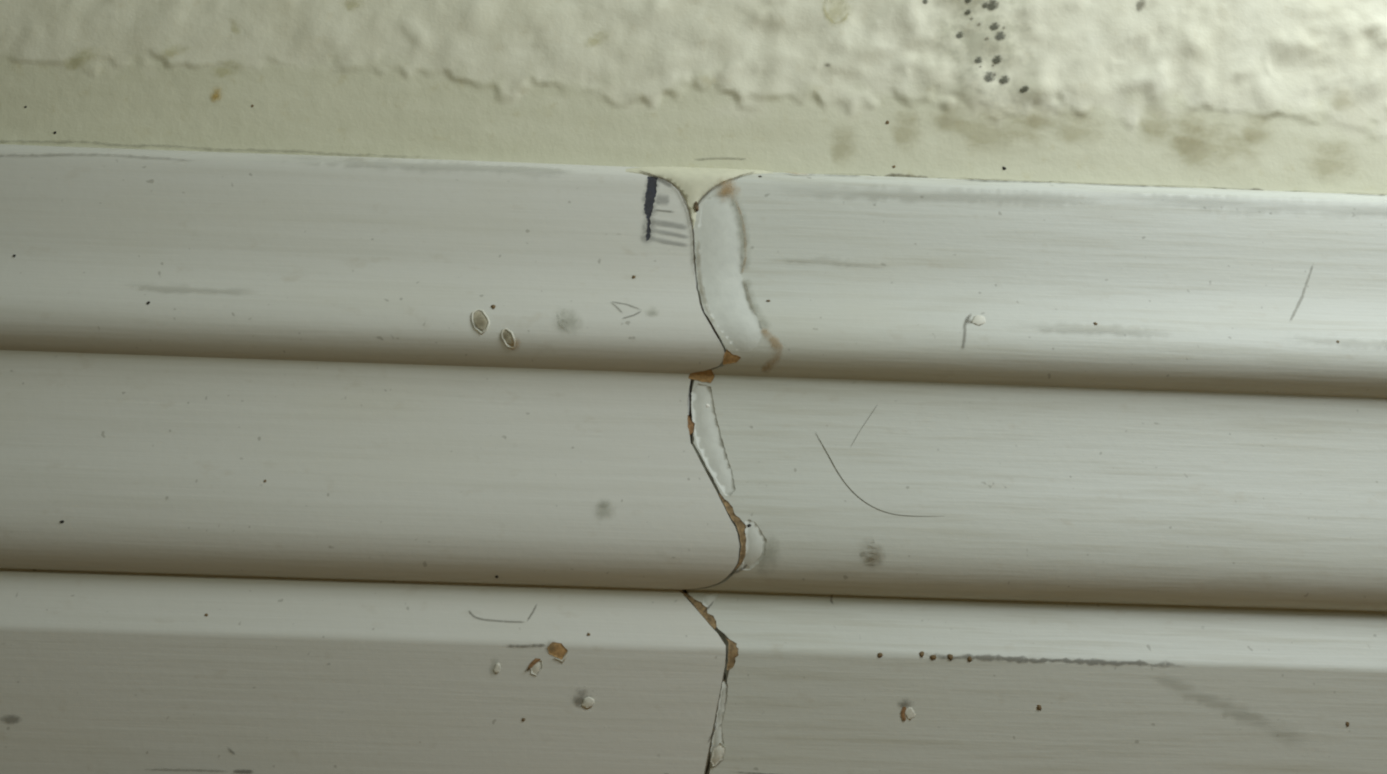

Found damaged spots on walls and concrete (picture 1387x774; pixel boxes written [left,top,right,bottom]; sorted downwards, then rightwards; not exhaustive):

damp [965,0,1028,93]
crack [688,242,741,444]
crack [718,493,747,570]
peeling [527,642,569,676]
crack [680,590,739,675]